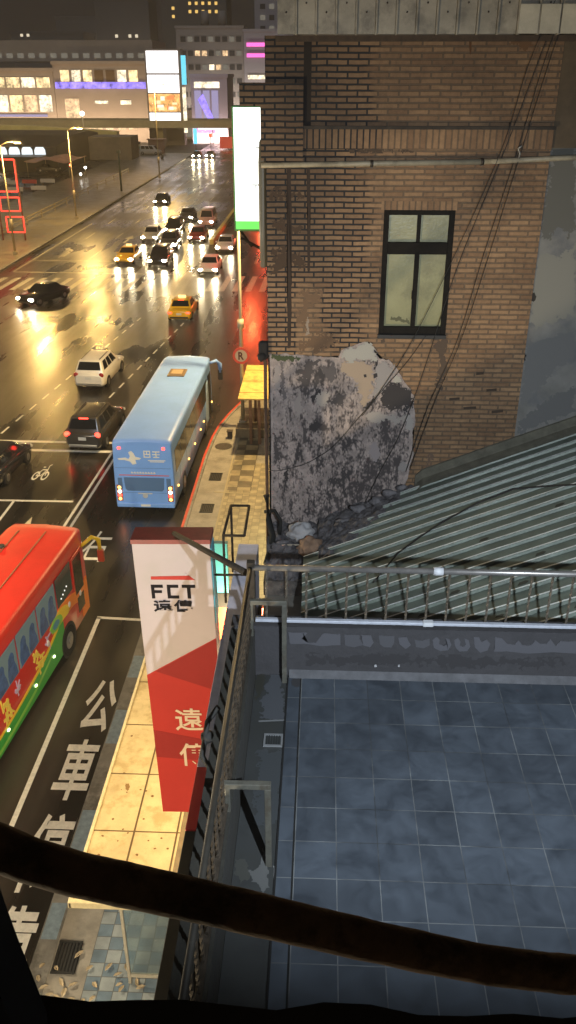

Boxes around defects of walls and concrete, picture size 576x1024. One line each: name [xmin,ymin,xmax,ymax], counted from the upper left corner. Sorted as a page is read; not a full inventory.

damp [541,148,576,241]
flaking render [315,391,330,407]
flaking render [341,360,414,430]
damp [272,359,414,523]
peeling [288,632,576,654]